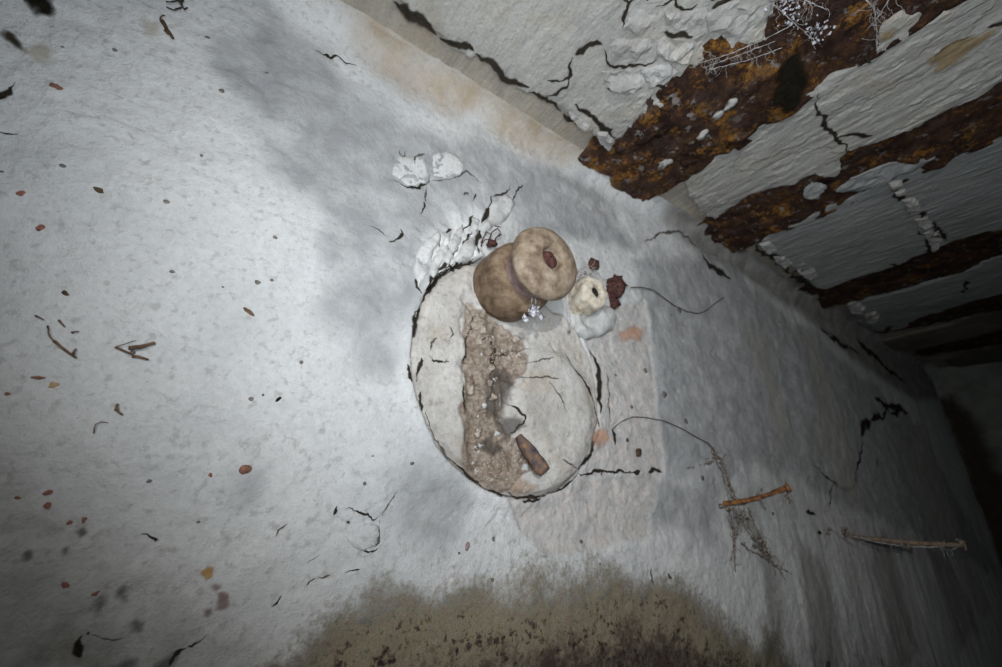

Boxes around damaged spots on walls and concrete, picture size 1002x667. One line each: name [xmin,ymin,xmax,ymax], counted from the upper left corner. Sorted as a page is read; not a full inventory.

spalling [601,0,761,96]
rust [930,32,993,71]
crack [0,83,15,99]
rust [771,52,809,114]
spalling [568,111,615,151]
spalling [803,156,943,252]
crack [371,226,404,242]
rust [588,257,599,271]
spalling [759,241,818,280]
crack [395,151,661,503]
crack [806,328,909,535]
leakage [522,622,718,667]